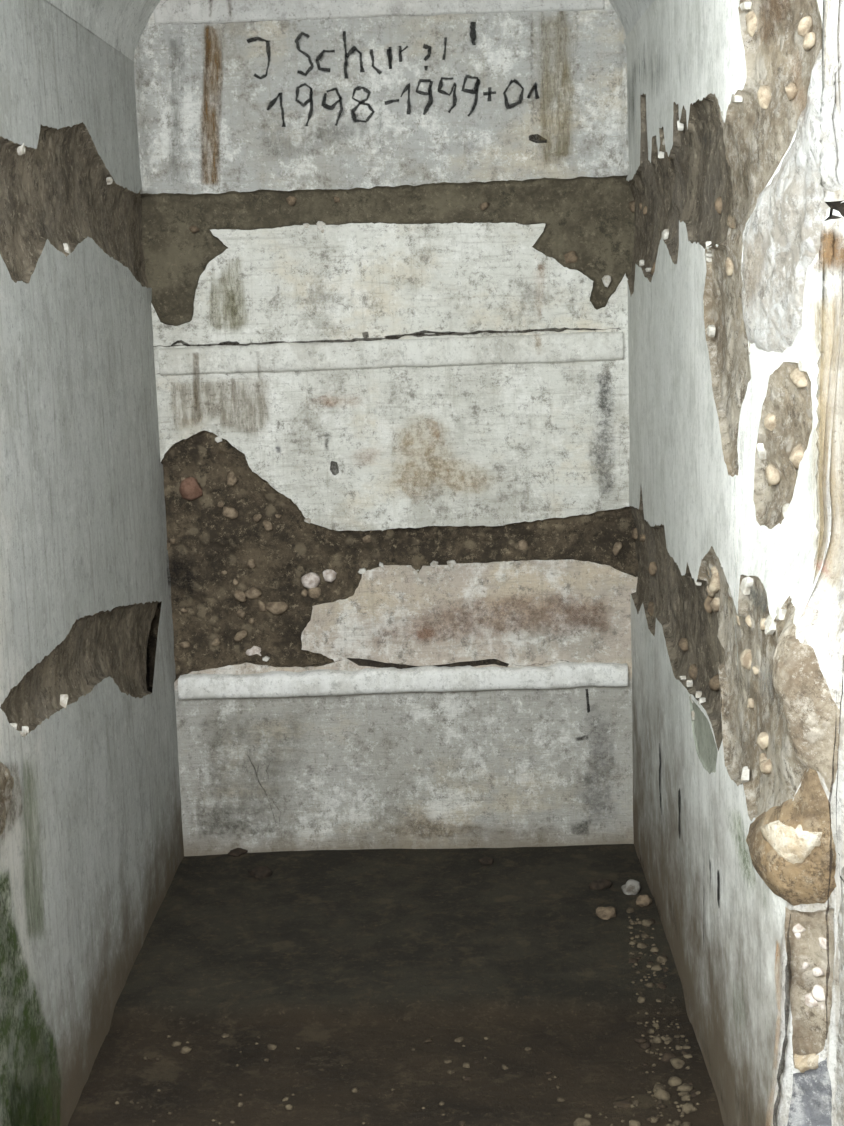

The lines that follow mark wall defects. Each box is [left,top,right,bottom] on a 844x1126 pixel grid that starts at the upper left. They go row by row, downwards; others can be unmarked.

corrosion [202,26,221,184]
crack [153,327,621,374]
spalling [0,0,844,529]
spalling [0,430,840,821]
crack [825,656,844,1039]
crack [773,914,792,1126]
spalling [785,867,844,1126]